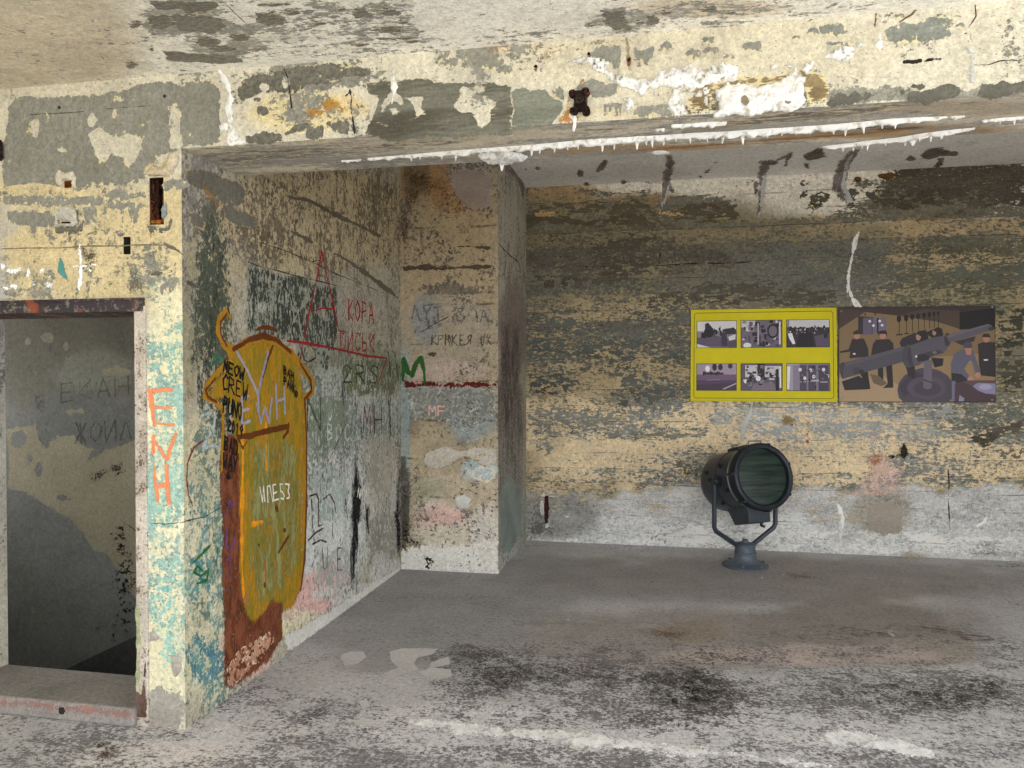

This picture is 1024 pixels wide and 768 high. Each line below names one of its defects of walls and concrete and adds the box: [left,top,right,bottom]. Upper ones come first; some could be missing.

peeling [129,1,250,64]
peeling [253,2,301,26]
peeling [336,4,419,47]
peeling [584,10,672,31]
peeling [885,13,965,44]
peeling [574,40,674,131]
peeling [687,70,1024,126]
peeling [2,53,564,255]
damp [341,33,1024,251]
efflorescence [846,231,862,307]
peeling [527,316,692,456]
peeling [6,268,220,693]